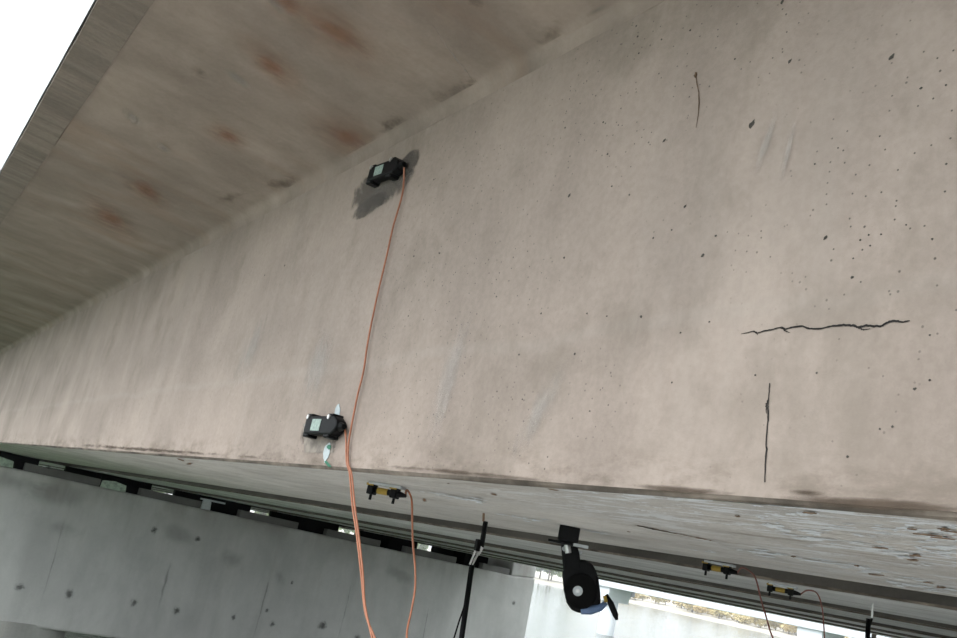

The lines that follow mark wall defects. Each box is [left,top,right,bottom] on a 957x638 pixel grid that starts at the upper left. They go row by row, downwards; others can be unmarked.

crack [693,72,701,127]
crack [742,320,910,335]
crack [763,383,771,482]
peeling [737,505,957,592]